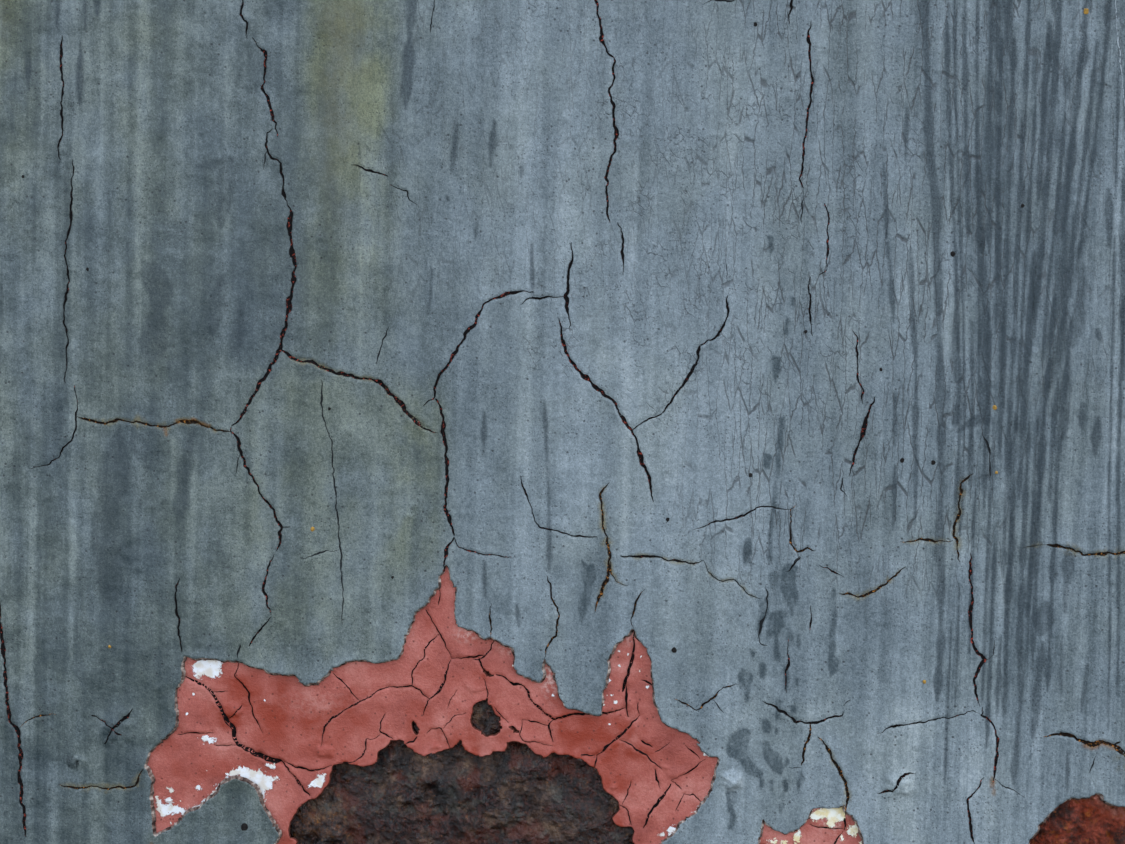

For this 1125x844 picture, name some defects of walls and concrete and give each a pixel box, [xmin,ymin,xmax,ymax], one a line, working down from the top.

crack [31,0,730,658]
crack [788,0,830,336]
leakage [925,74,941,314]
leakage [935,0,1111,742]
leakage [1092,98,1125,451]
peeling [147,566,718,844]
corrosion [290,699,634,844]
crack [520,476,850,815]
peeling [760,807,862,844]
crack [696,432,1022,844]
corrosion [1030,794,1125,844]
leakage [1108,461,1120,684]